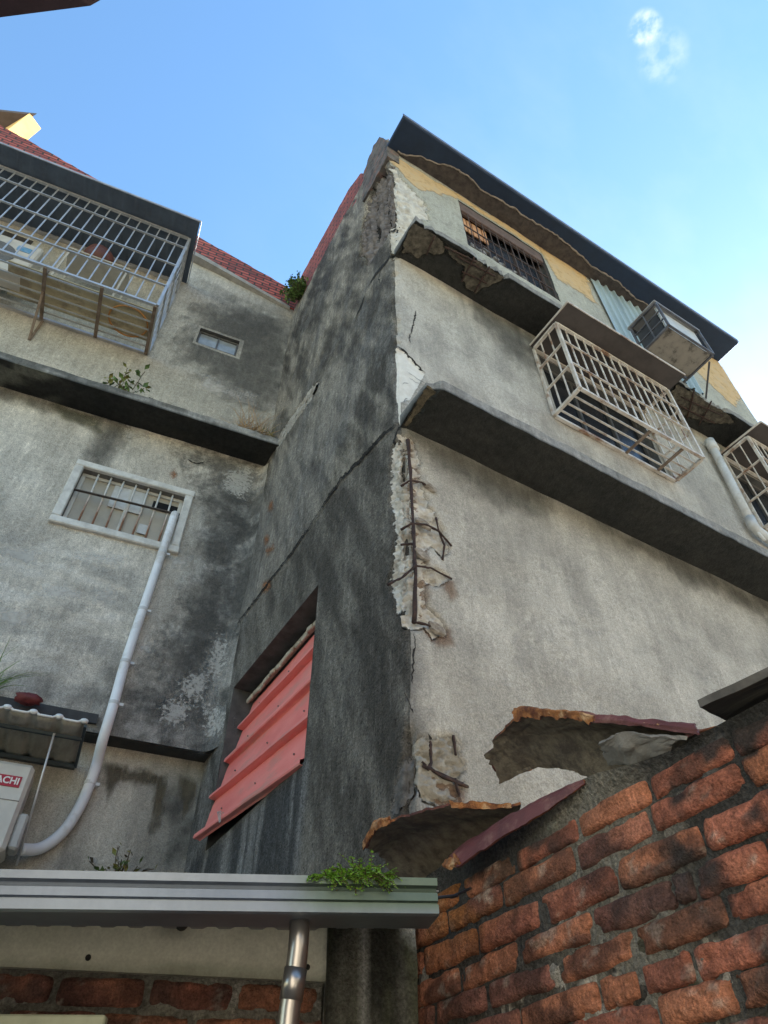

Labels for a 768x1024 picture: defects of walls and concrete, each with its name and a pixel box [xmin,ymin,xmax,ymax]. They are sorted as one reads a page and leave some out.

spalling [360,166,429,265]
peeling [397,150,648,306]
leakage [136,449,258,737]
crack [237,425,400,624]
spalling [387,434,453,642]
leakage [106,765,196,853]
spalling [411,734,469,806]